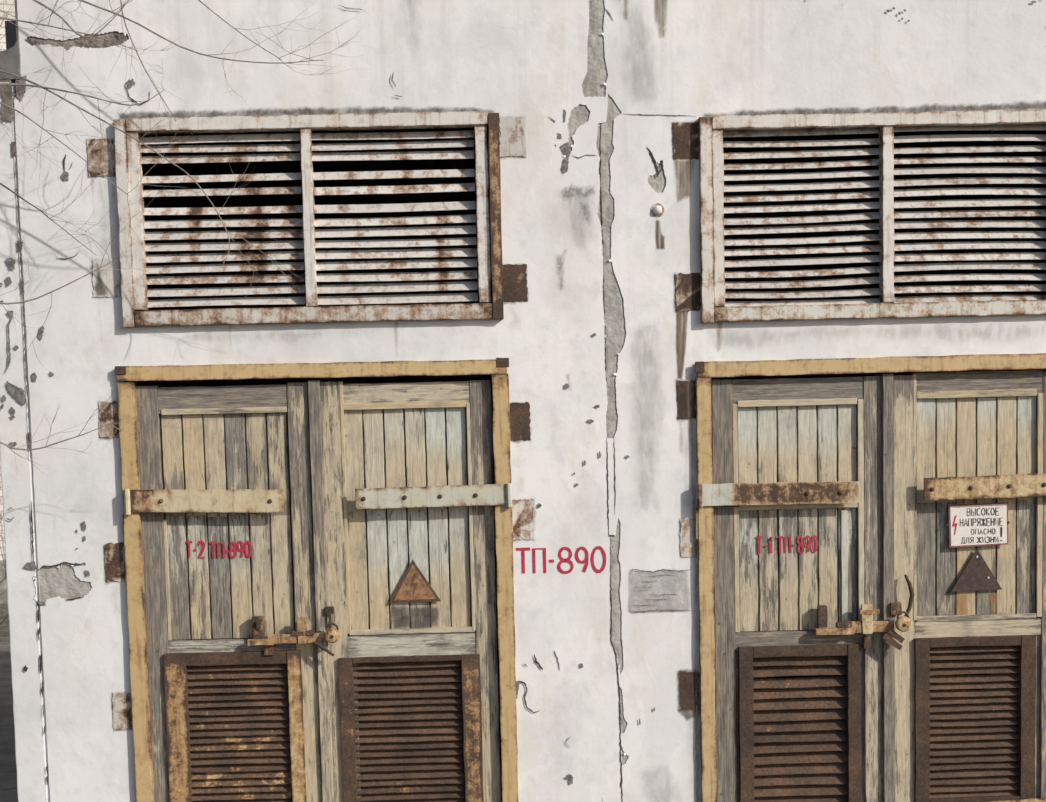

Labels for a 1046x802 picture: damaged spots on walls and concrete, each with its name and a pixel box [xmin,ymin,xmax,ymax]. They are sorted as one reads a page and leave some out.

spalling [25,31,129,51]
peeling [548,104,600,174]
crack [647,147,663,177]
crack [599,127,607,382]
spalling [23,561,92,605]